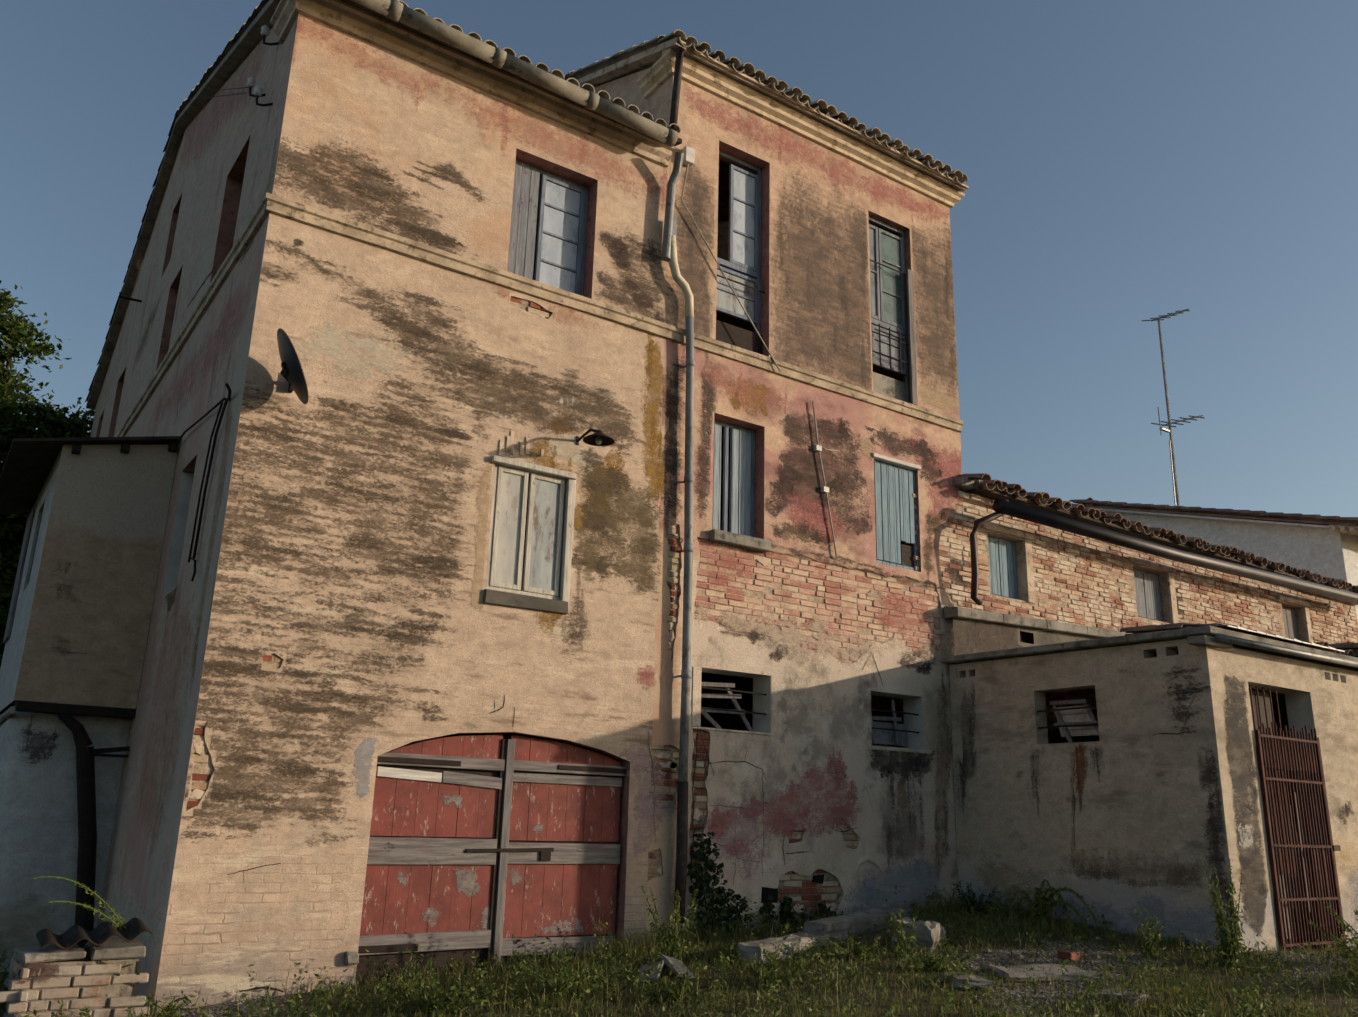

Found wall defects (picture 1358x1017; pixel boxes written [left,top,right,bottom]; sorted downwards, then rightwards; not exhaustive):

water stain [274,138,485,254]
water stain [181,165,715,846]
spalling [666,524,942,665]
water stain [763,405,1021,654]
water stain [21,714,60,764]
spalling [186,722,231,811]
spalling [647,849,662,881]
spalling [650,729,710,879]
spalling [748,869,842,932]
water stain [899,648,952,864]
corrosion [1075,743,1088,808]
water stain [1044,667,1268,941]